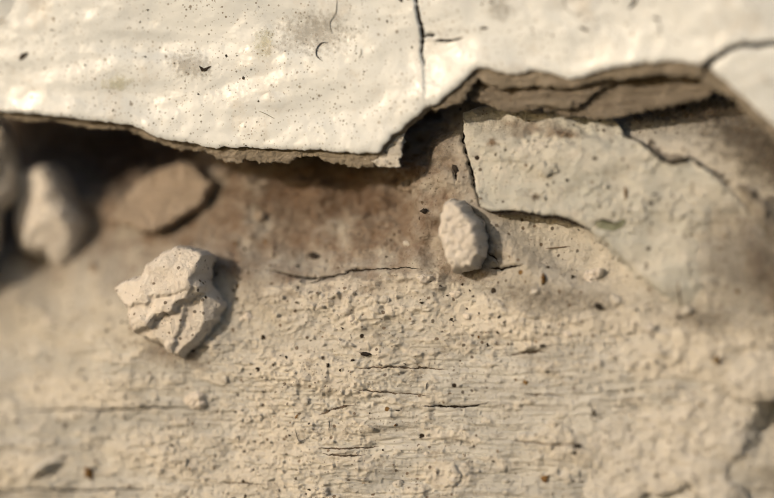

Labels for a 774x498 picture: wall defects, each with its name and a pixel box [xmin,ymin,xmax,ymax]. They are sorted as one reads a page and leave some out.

crack [415,0,463,67]
crack [703,42,774,71]
peeling [0,0,774,169]
flaking render [110,161,216,233]
crack [455,132,623,230]
crack [621,133,728,185]
peeling [594,219,626,231]
crack [269,267,417,283]
crack [488,253,524,271]